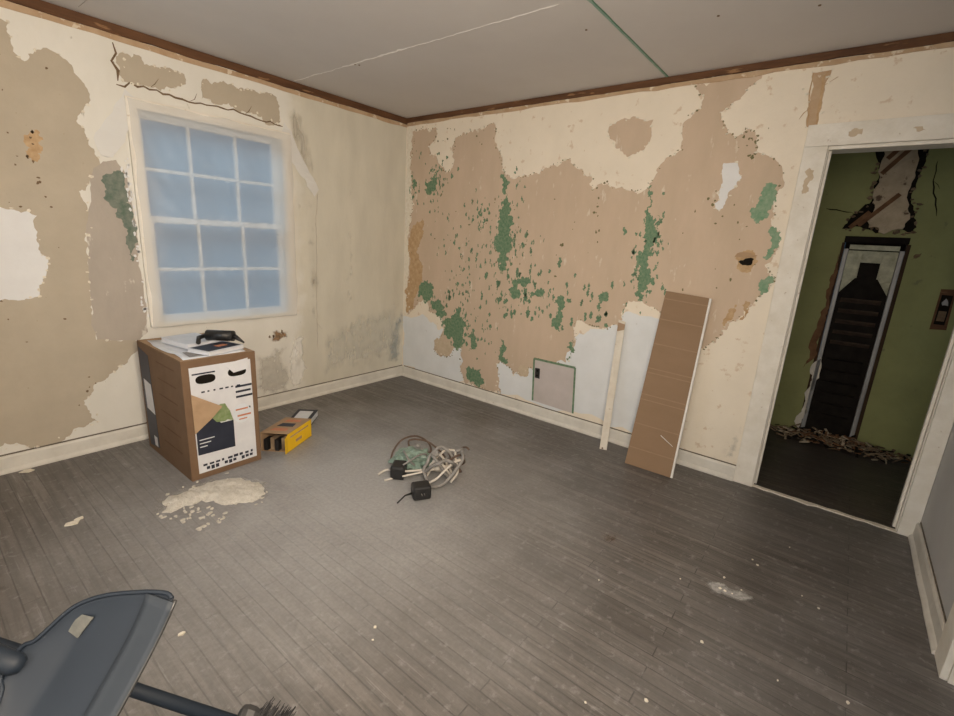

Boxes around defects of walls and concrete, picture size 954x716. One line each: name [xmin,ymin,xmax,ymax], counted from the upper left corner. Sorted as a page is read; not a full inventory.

peeling [116,51,186,91]
peeling [201,78,281,126]
peeling [802,68,834,128]
flaking render [842,151,885,233]
flaking render [892,149,929,236]
peeling [0,19,149,449]
peeling [403,74,785,433]